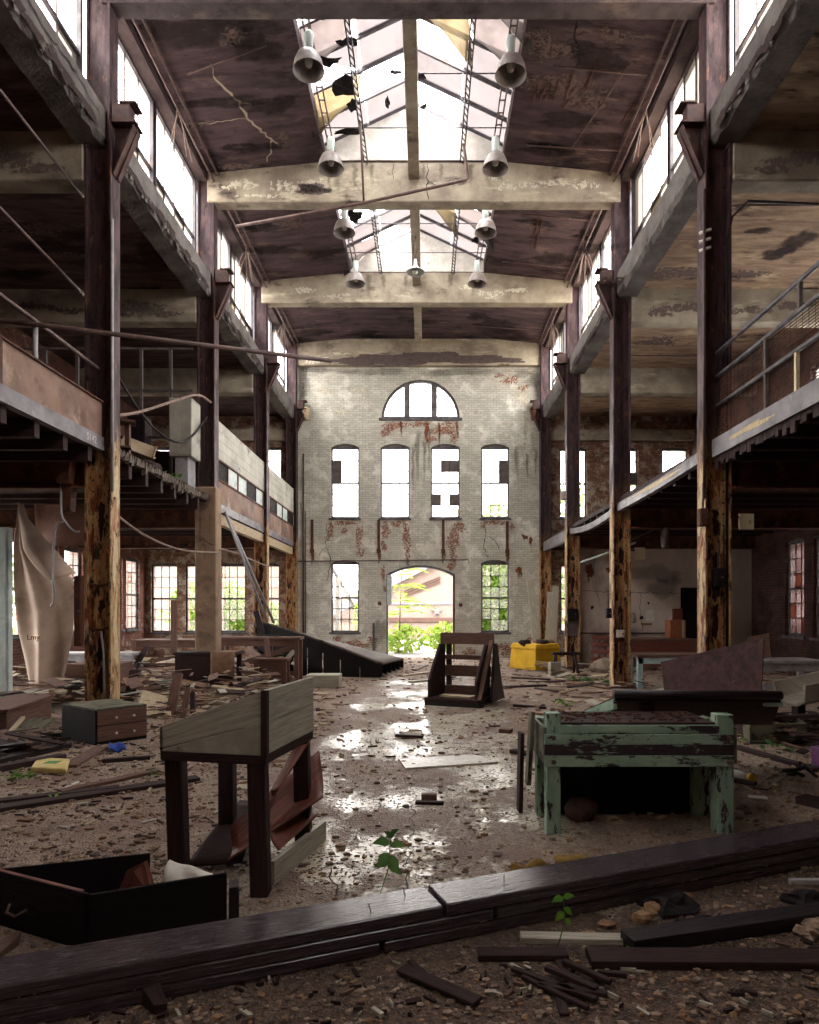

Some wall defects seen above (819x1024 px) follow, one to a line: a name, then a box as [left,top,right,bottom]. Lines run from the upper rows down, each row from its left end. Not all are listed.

crack [200,64,278,162]
peeling [294,182,332,195]
water stain [764,231,819,260]
peeling [332,351,528,392]